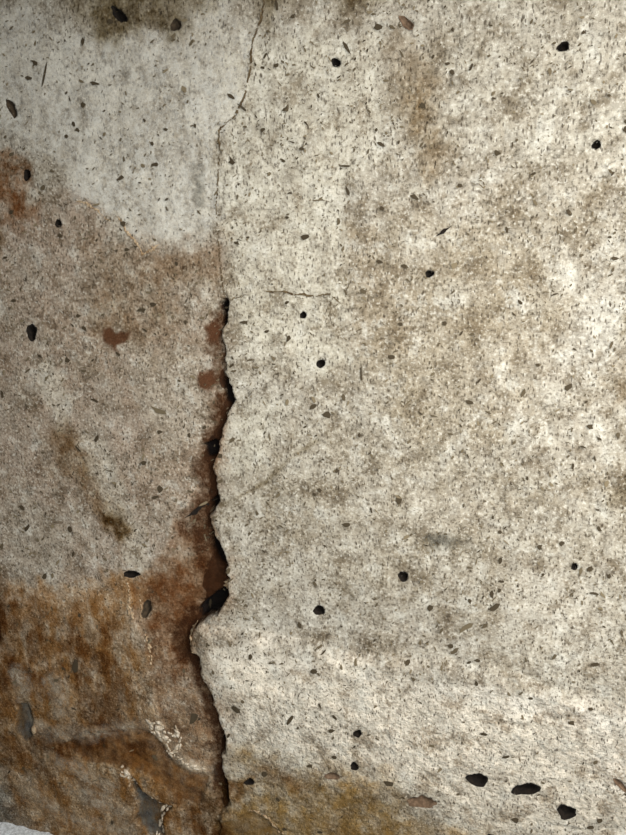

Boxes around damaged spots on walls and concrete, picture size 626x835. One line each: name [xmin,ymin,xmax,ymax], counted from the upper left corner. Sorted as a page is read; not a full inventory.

crack [215,0,341,324]
crack [185,370,236,709]
corrosion [194,392,234,556]
spalling [66,719,209,835]
corrosion [203,693,227,783]
crack [219,734,229,807]